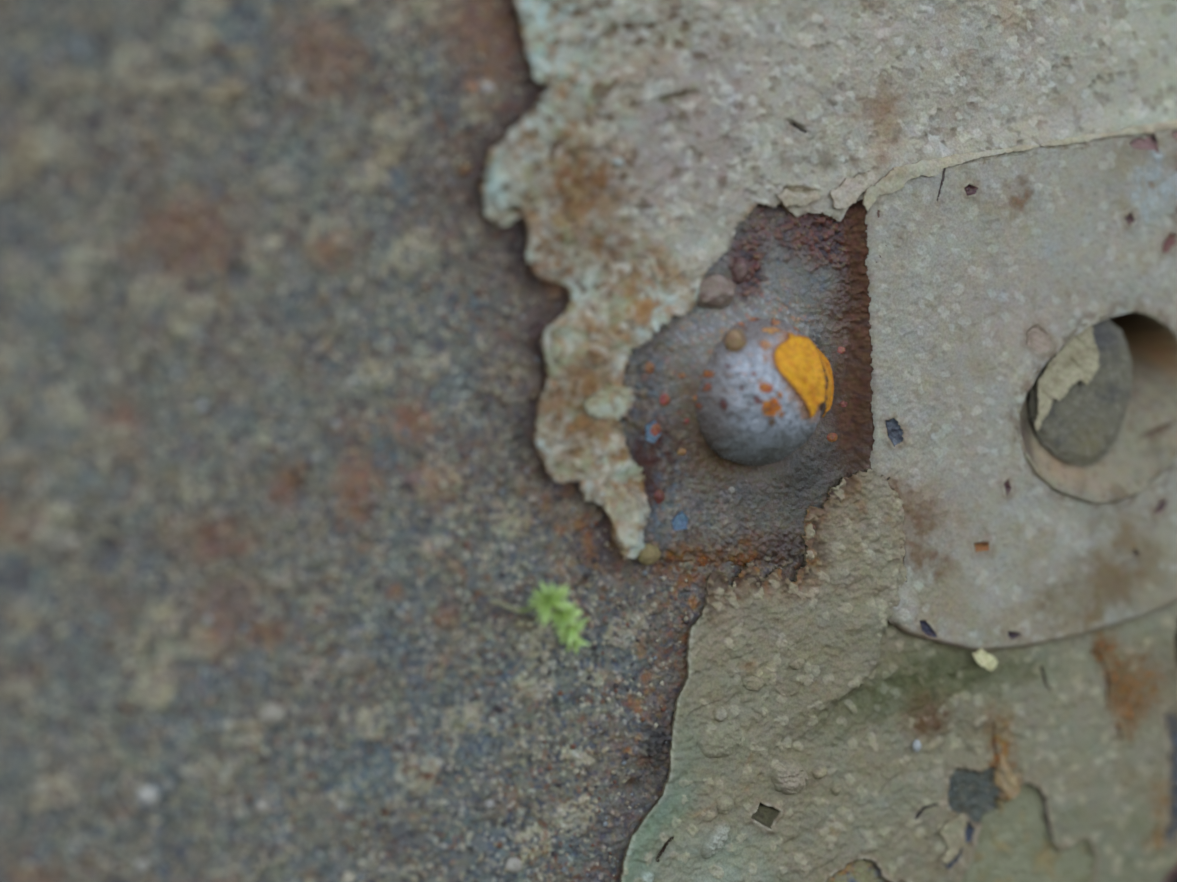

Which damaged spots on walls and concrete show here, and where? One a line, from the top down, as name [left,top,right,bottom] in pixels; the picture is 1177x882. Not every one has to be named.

crack [937,168,945,201]
corrosion [697,257,749,309]
corrosion [820,203,872,449]
corrosion [684,365,731,425]
corrosion [752,372,784,426]
corrosion [635,419,687,504]
peeling [479,0,1177,882]